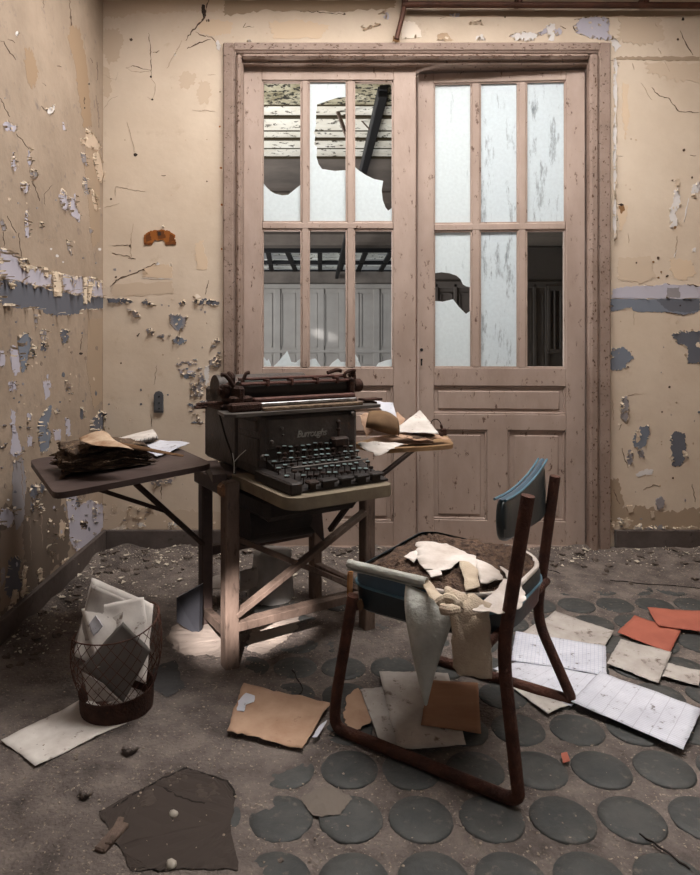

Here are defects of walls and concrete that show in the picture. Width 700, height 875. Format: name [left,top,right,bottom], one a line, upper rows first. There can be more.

crack [90,0,216,99]
crack [611,60,699,113]
peeling [314,15,624,240]
peeling [0,247,106,298]
crack [110,224,155,287]
corrosion [144,229,176,245]
peeling [591,219,700,329]
peeling [136,304,189,345]
peeling [672,329,700,364]
peeling [176,337,222,425]
peeling [0,314,198,654]
peeling [661,431,694,479]